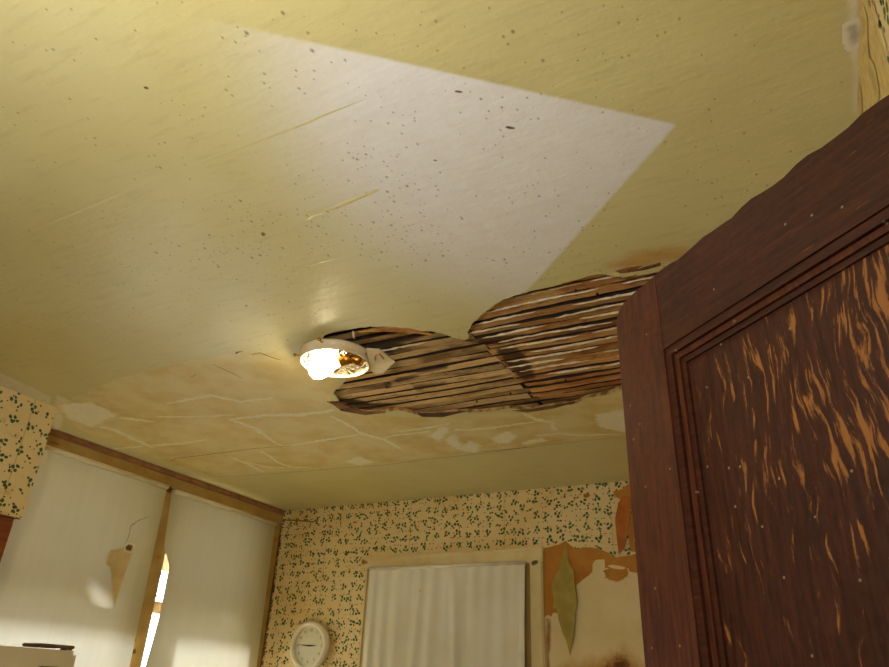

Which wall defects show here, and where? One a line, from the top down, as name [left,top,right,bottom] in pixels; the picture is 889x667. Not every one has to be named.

peeling [53,263,661,476]
peeling [615,496,631,554]
damp [545,615,645,667]
flaking render [550,544,643,659]